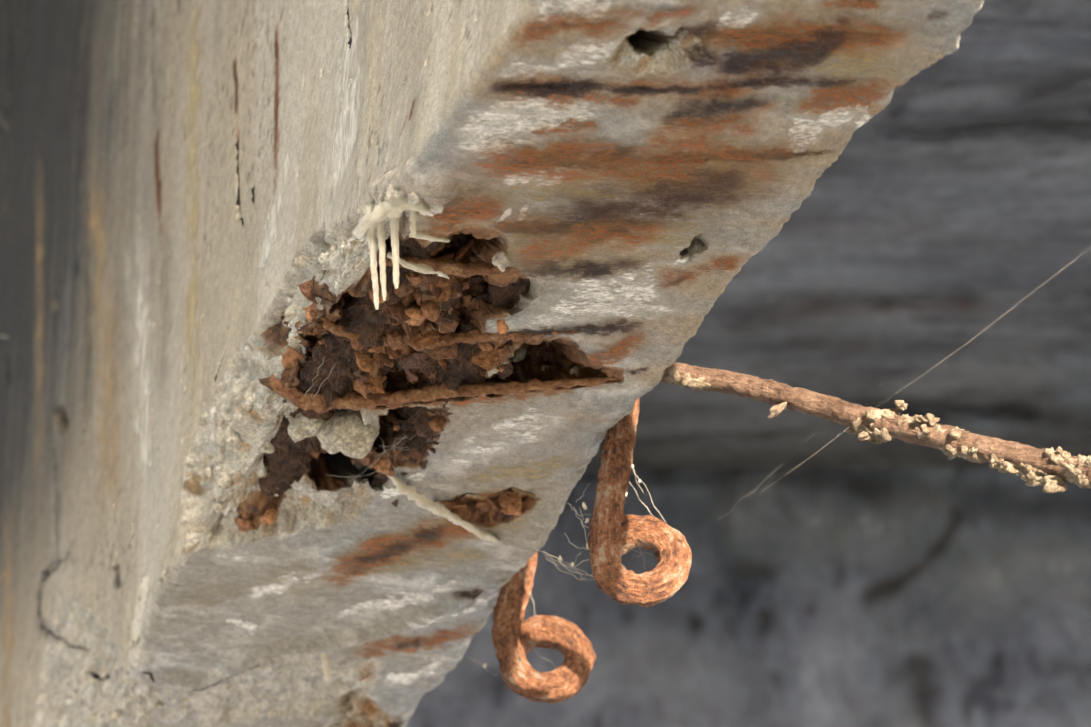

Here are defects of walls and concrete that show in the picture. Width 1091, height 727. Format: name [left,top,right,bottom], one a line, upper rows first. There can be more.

spalling [603,22,717,76]
corrosion [429,0,903,281]
water stain [353,196,435,239]
water stain [409,232,450,243]
water stain [386,252,450,279]
corrosion [658,256,737,288]
spalling [180,177,625,555]
corrosion [507,319,644,365]
corrosion [325,520,480,585]
crack [38,554,112,680]
corrosion [359,627,469,659]
corrosion [323,673,403,727]